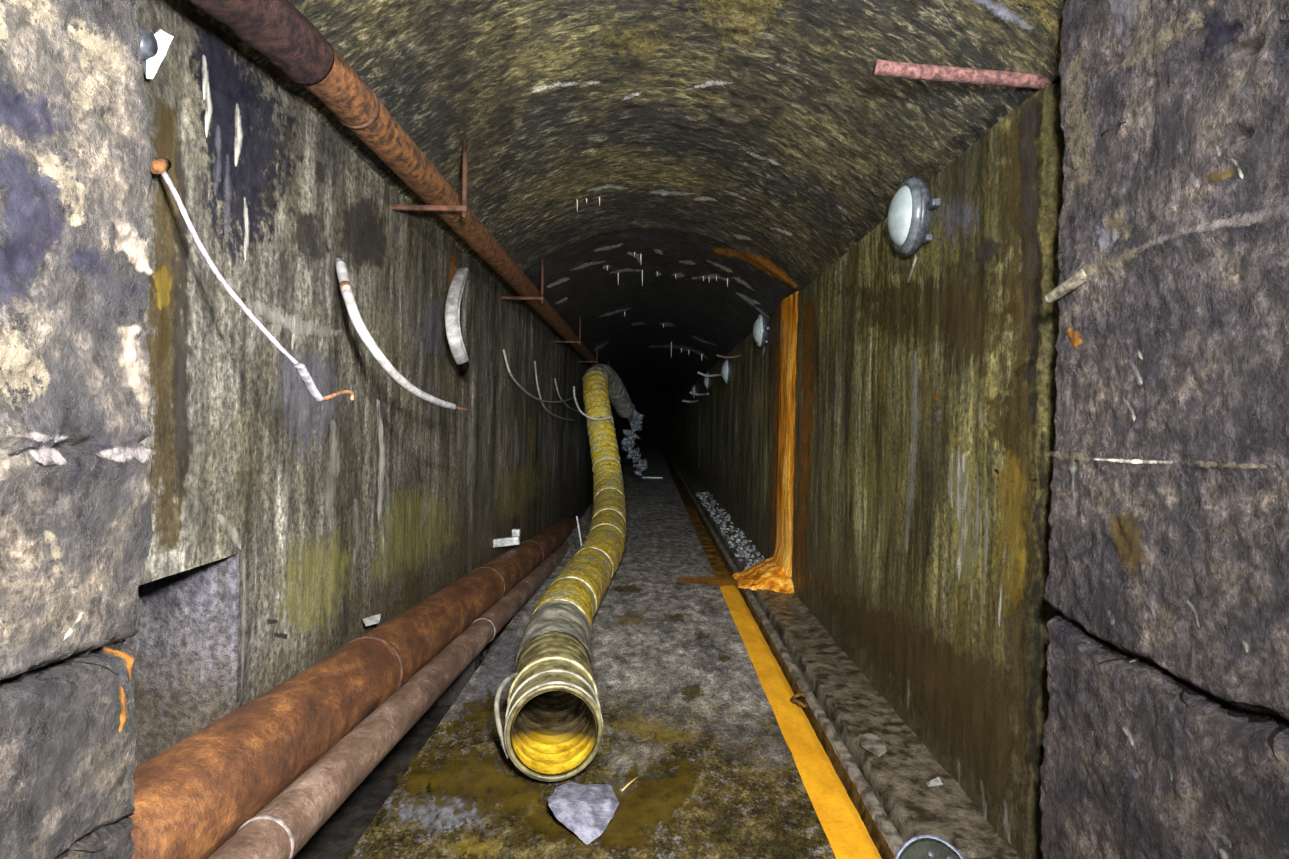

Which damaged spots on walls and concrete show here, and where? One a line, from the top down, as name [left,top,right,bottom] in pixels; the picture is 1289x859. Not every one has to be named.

water stain [277,420,358,629]
water stain [372,399,454,581]
water stain [467,362,493,485]
corrosion [677,247,816,594]
water stain [821,98,1289,843]
crack [1056,609,1289,761]